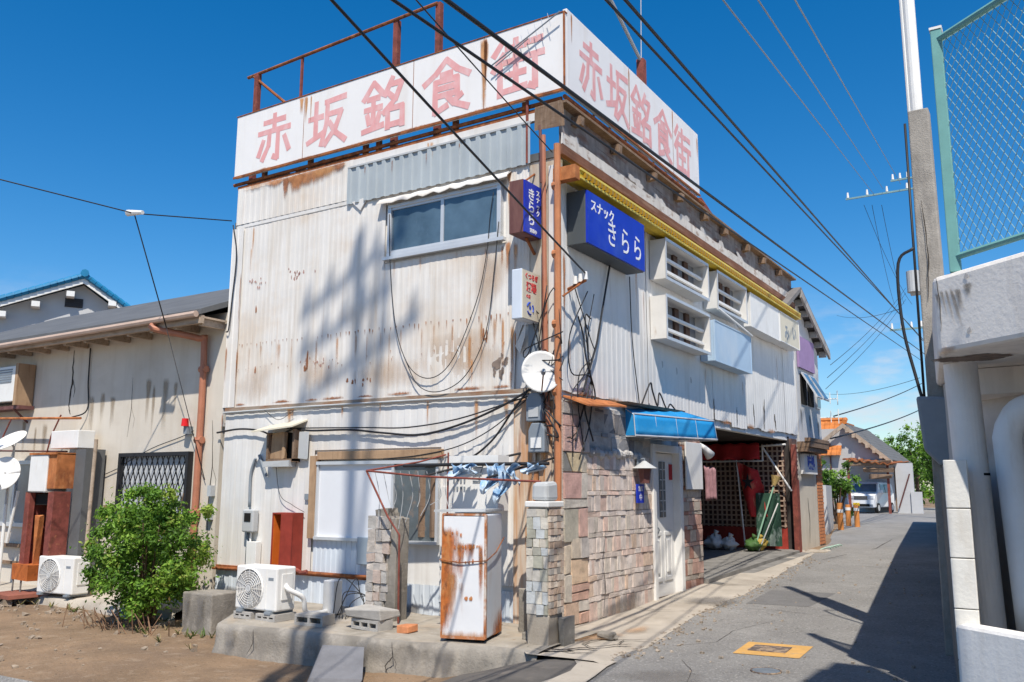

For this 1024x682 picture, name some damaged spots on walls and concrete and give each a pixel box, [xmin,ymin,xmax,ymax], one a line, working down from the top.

corrosion [251,163,345,195]
corrosion [438,312,516,372]